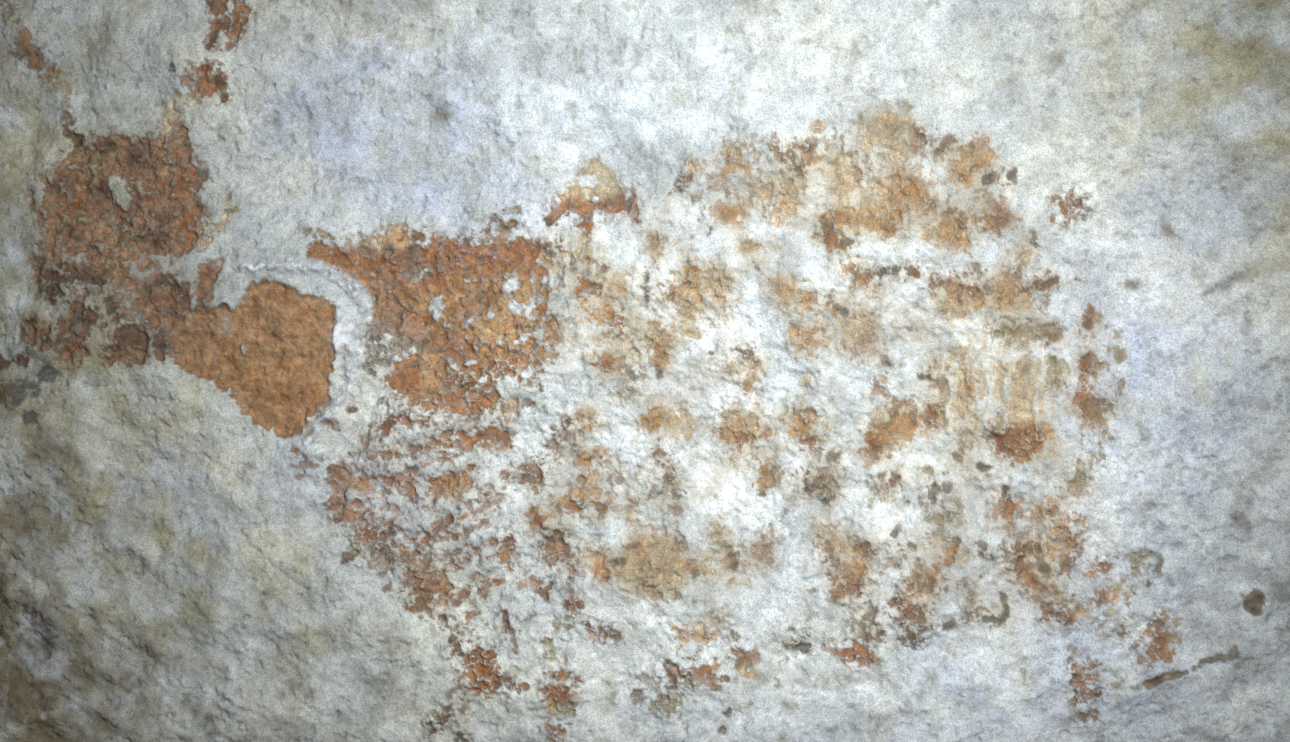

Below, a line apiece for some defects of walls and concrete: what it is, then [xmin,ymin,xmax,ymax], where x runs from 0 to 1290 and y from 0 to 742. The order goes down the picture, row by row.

rust [164,0,251,134]
rust [1050,186,1092,230]
flaking render [0,101,845,663]
rust [1067,304,1127,448]
rust [952,420,1054,472]
peeling [630,607,761,718]
rust [1067,647,1106,723]
rust [1129,610,1182,667]